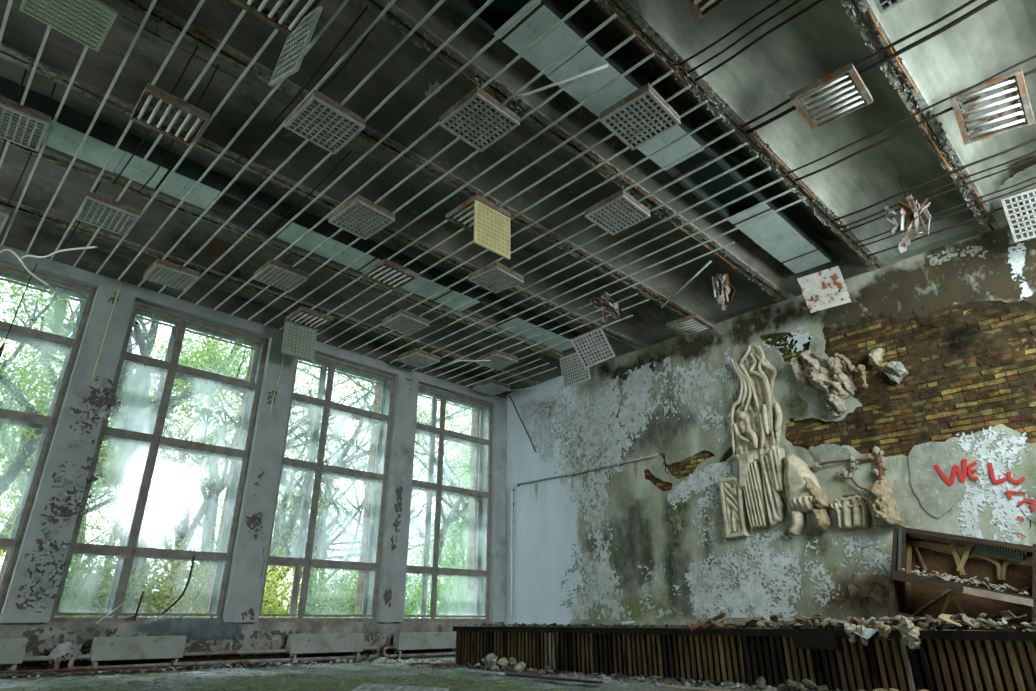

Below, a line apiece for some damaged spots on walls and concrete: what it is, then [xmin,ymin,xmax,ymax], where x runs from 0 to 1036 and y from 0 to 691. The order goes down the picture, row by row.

peeling [13,373,121,614]
leakage [587,502,692,619]
peeling [519,346,892,619]
flaking render [760,243,1036,544]